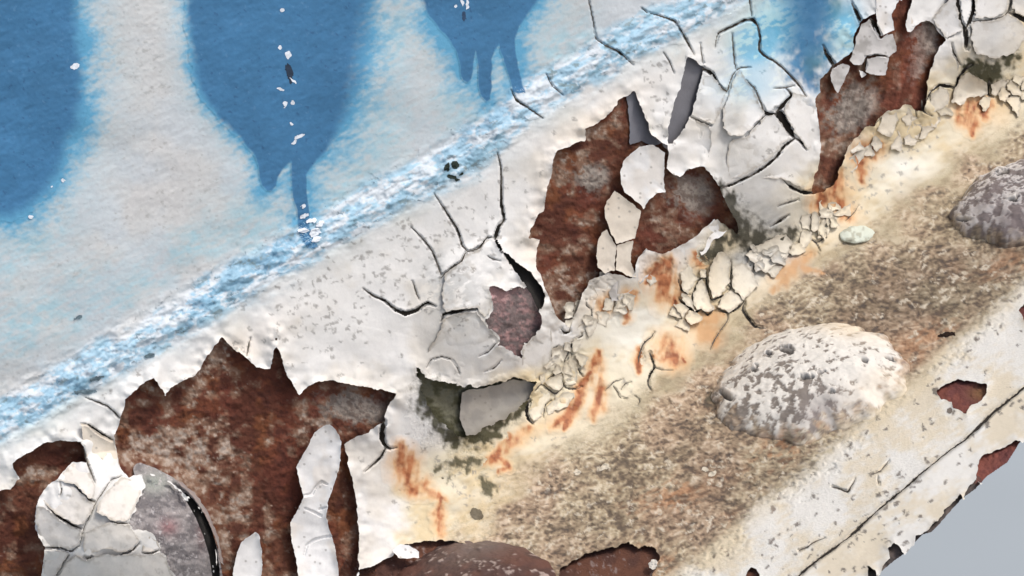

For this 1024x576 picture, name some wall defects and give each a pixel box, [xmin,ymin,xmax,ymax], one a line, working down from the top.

crack [642,0,813,226]
crack [412,152,505,278]
peeling [416,0,1024,437]
peeling [0,337,453,576]
rust [380,434,452,541]
crack [363,283,478,321]
rust [480,346,613,477]
crack [525,302,668,424]
rust [588,244,733,381]
crack [674,264,763,350]
peeling [915,440,1021,542]
peeling [559,542,660,576]